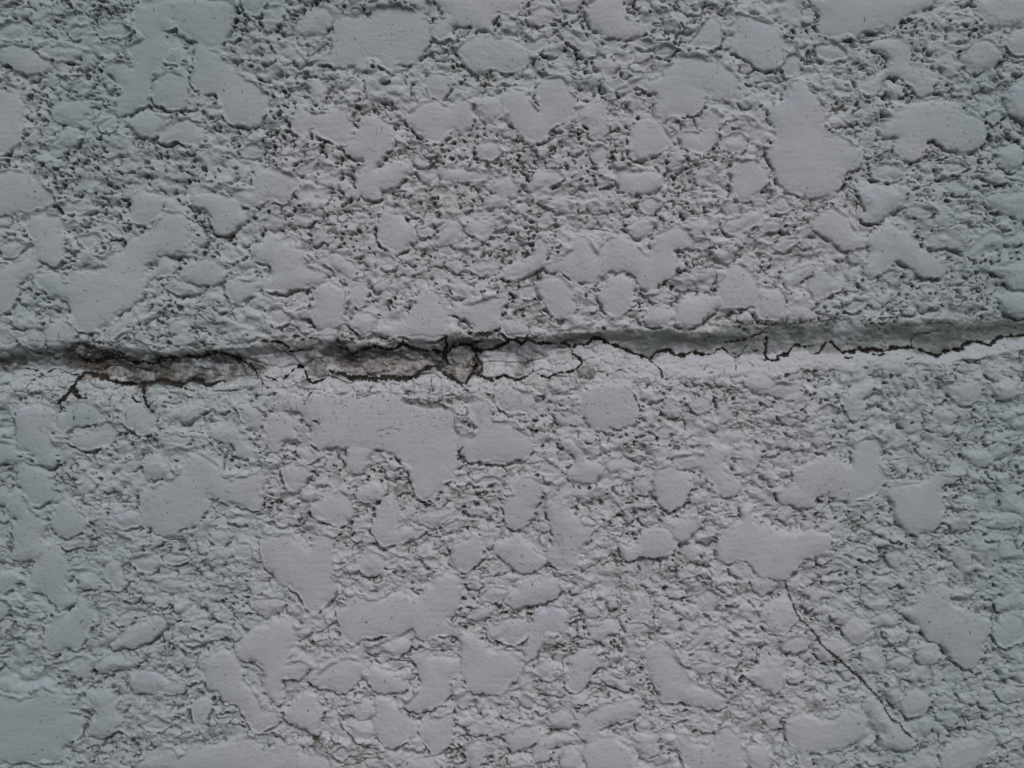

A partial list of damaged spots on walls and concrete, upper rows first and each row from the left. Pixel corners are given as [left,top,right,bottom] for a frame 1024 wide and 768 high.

spalling [67,342,197,383]
spalling [333,341,483,385]
crack [10,329,1024,432]
crack [769,572,918,746]